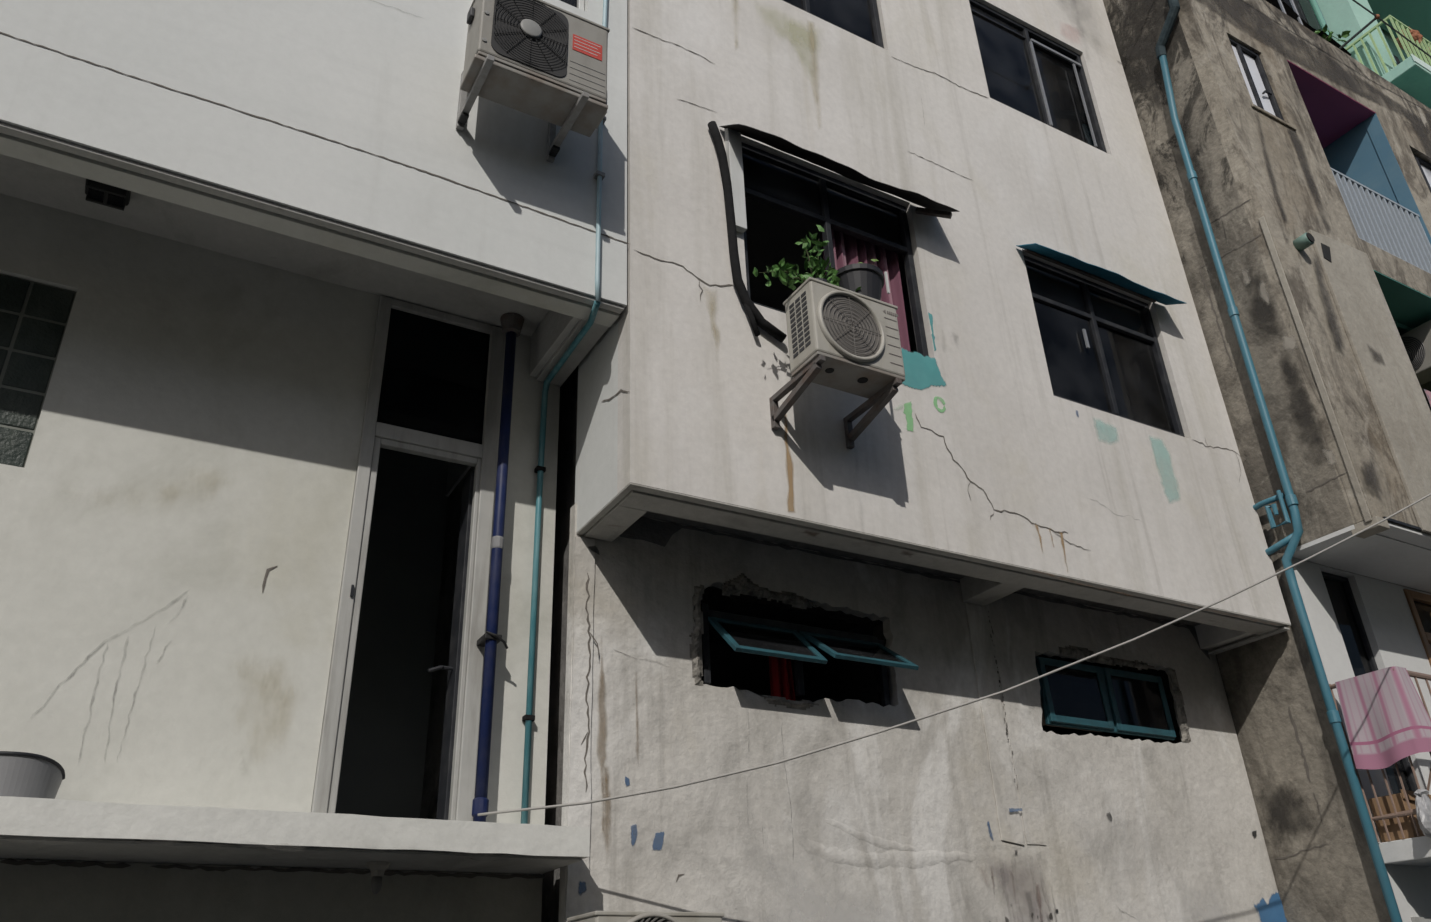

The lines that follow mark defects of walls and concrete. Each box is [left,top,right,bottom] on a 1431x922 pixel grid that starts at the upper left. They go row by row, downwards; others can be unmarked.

water stain [1198,0,1431,159]
crack [0,32,732,300]
water stain [1191,156,1214,217]
water stain [1288,130,1319,201]
water stain [1243,271,1335,464]
rust [785,415,794,511]
crack [915,414,1088,550]
crack [581,573,599,790]
flaking render [689,585,704,686]
flaking render [722,573,817,609]
flaking render [762,695,819,710]
flaking render [1059,645,1191,743]